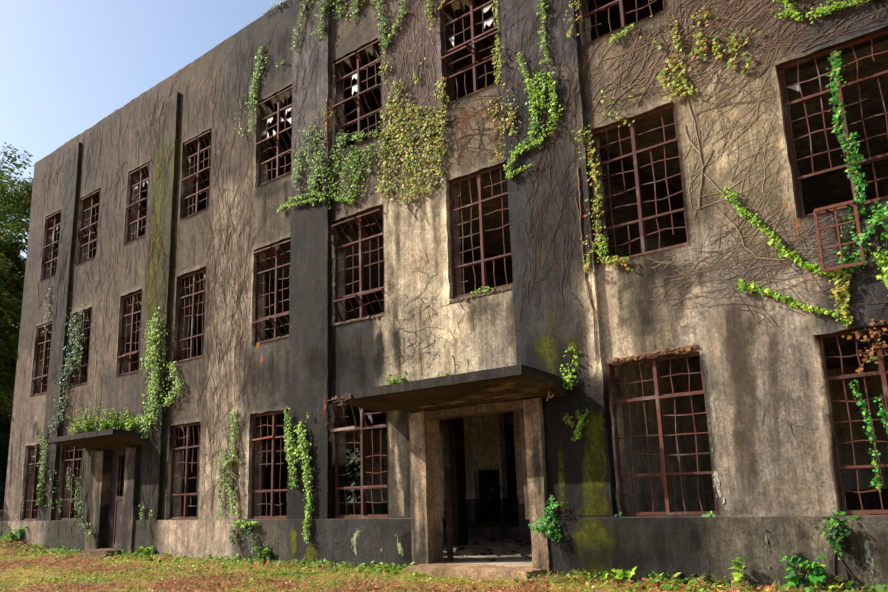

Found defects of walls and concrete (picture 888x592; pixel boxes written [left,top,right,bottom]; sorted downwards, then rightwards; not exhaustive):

damp [703,306,754,398]
damp [814,353,824,405]